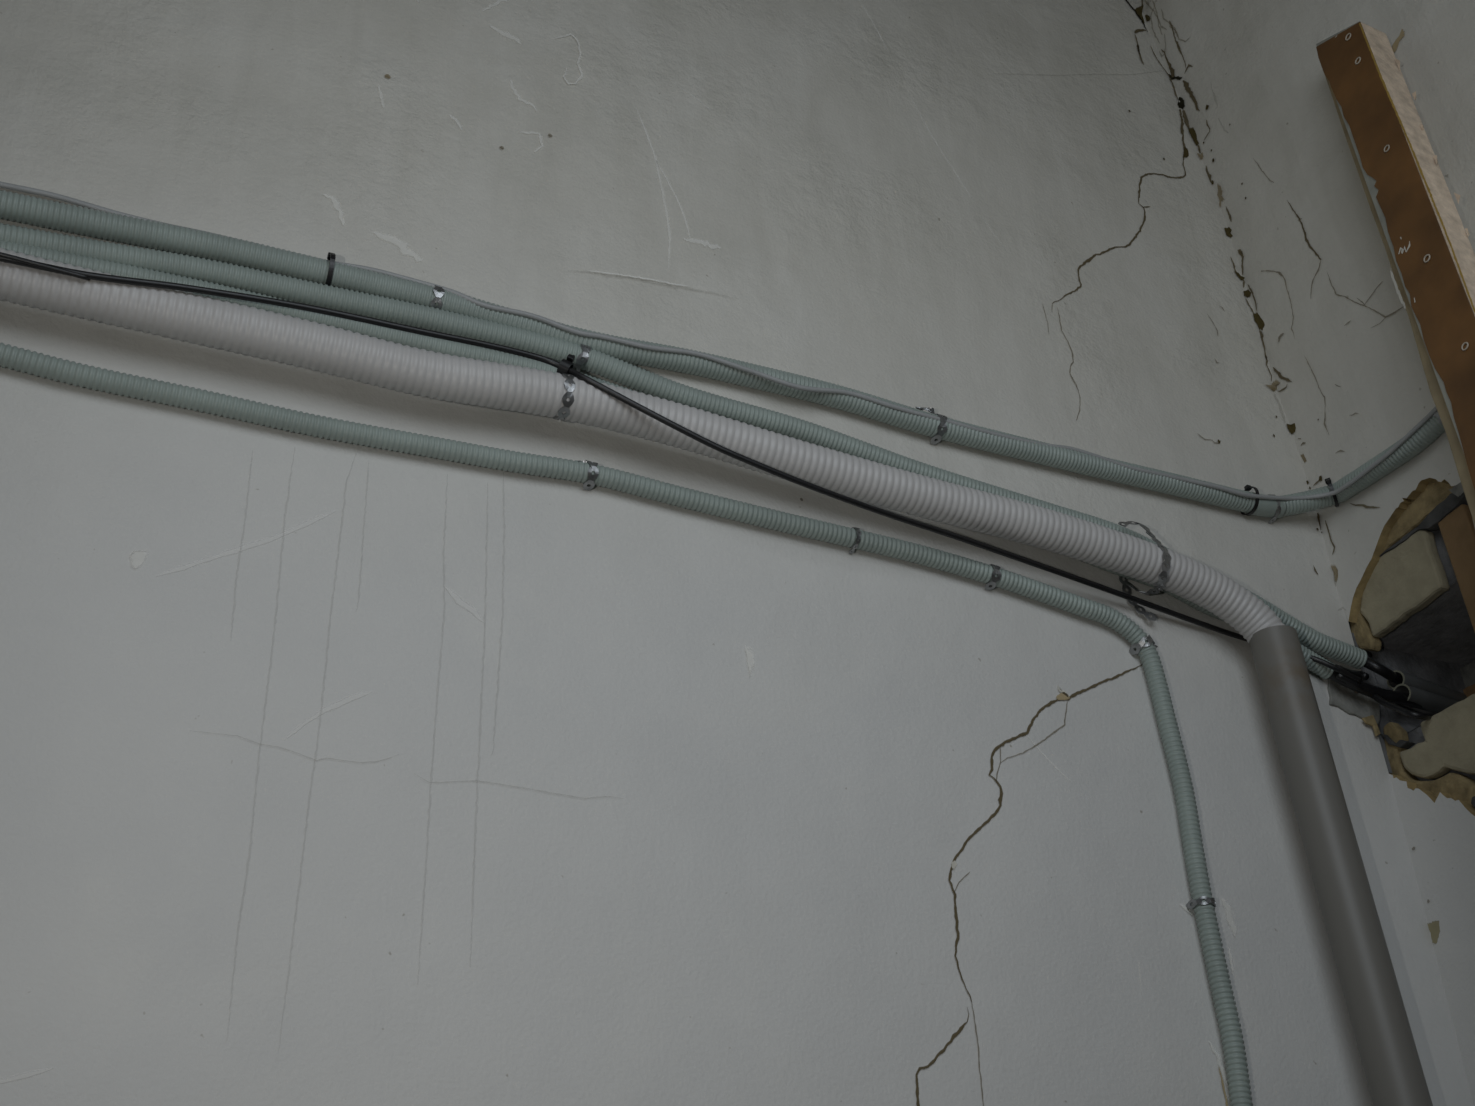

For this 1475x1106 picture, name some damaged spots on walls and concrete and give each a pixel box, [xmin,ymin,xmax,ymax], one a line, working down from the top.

crack [1043,0,1404,582]
flaking render [1327,480,1475,808]
crack [916,664,1143,1106]
flaking render [1427,921,1440,945]